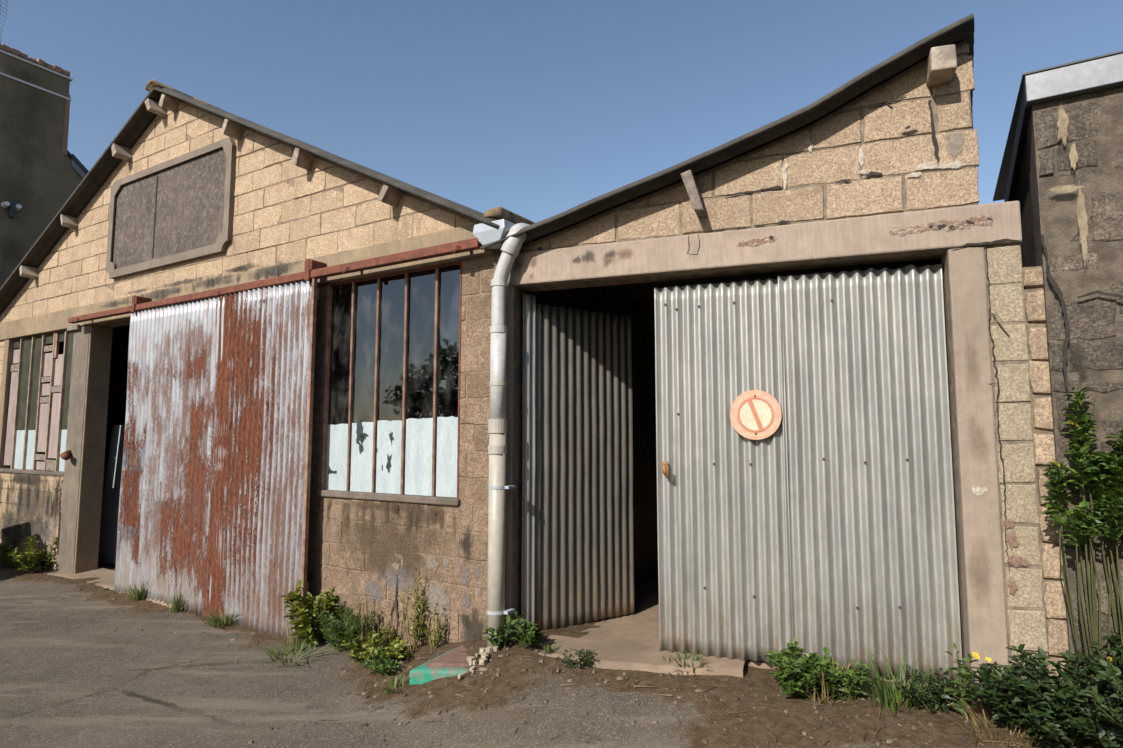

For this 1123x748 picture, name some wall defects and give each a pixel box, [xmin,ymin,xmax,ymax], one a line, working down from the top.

spalling [738,236,778,246]
spalling [892,215,993,236]
corrosion [117,285,312,631]
peeling [356,419,394,473]
damp [0,473,60,545]